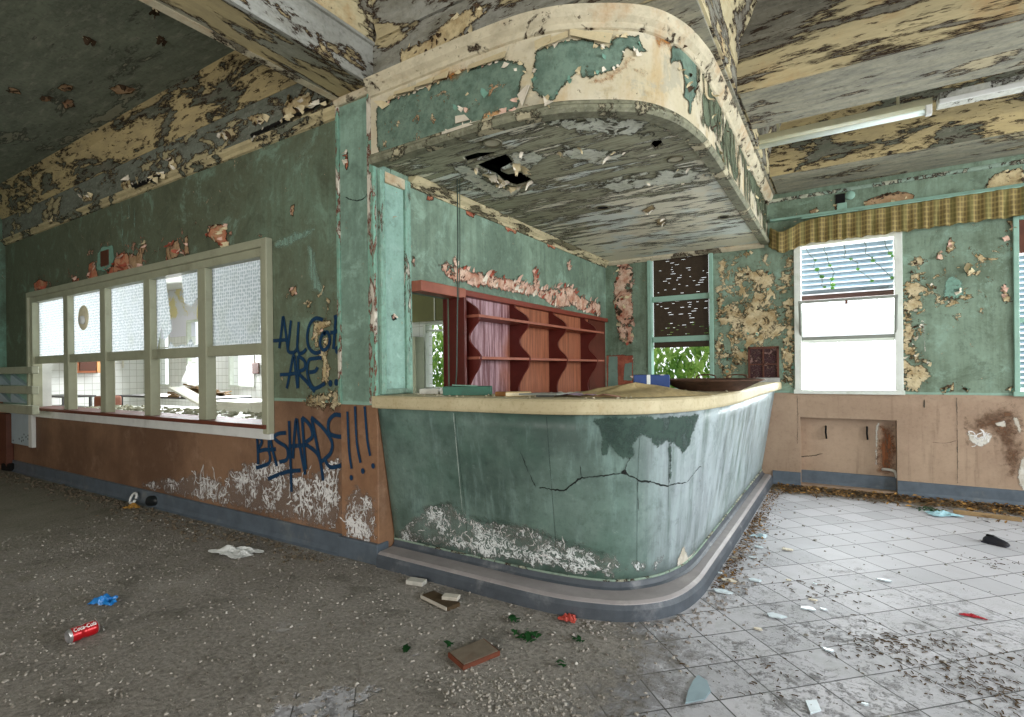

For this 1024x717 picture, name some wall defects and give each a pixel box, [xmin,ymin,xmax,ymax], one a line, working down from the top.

peeling [399,3,489,62]
peeling [247,92,328,141]
peeling [374,29,670,198]
peeling [284,249,341,411]
peeling [441,256,601,317]
peeling [606,264,635,386]
peeling [714,250,795,388]
peeling [903,220,1016,393]
leakage [146,458,377,542]
leakage [399,504,619,578]
crack [520,452,701,509]
leakage [967,410,1024,490]